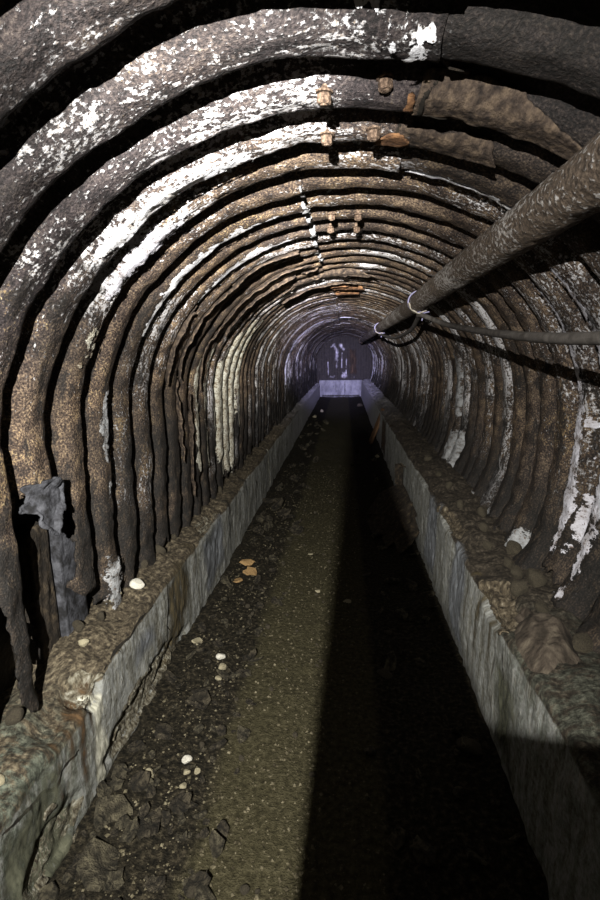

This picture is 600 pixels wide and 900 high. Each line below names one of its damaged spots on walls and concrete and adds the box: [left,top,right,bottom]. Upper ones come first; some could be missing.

damp [298,186,323,262]
peeling [18,476,67,536]